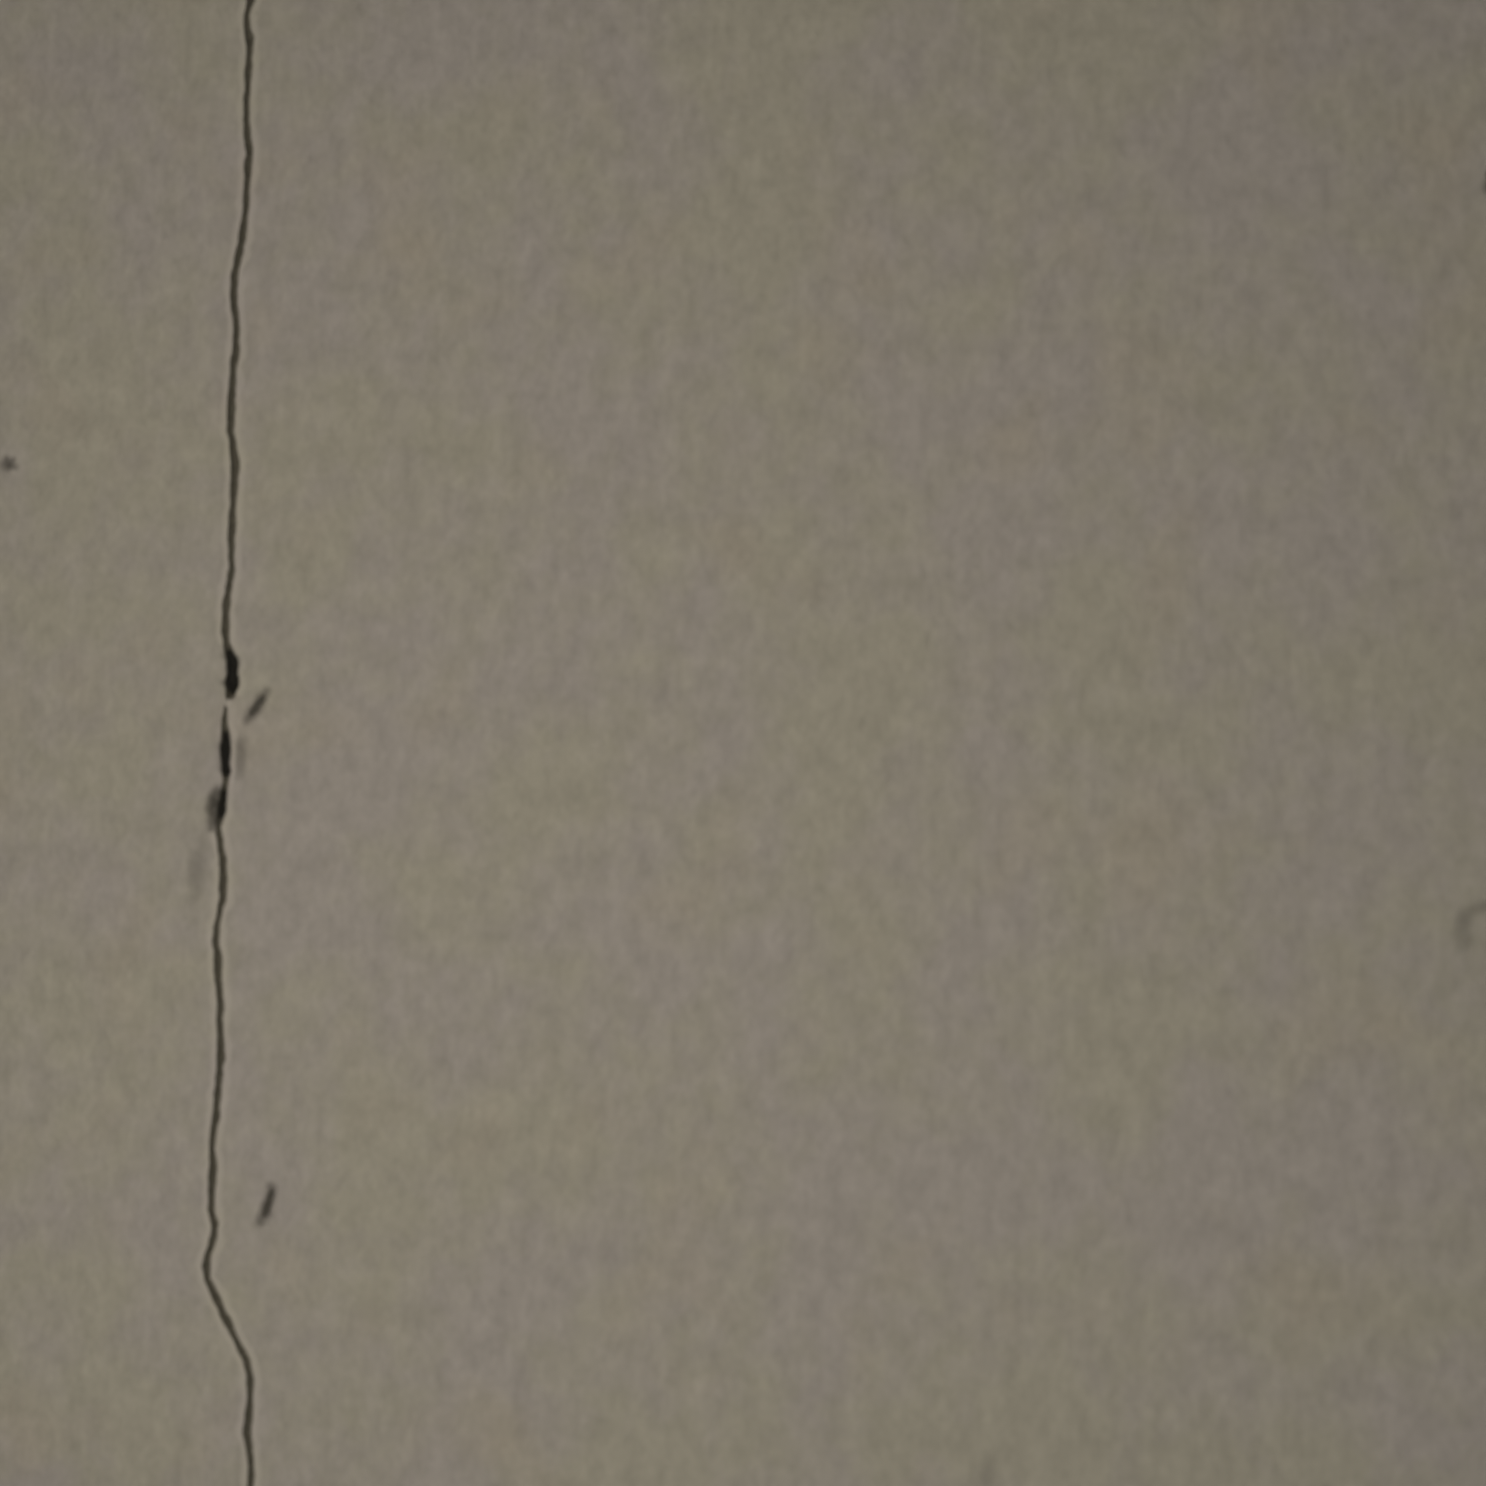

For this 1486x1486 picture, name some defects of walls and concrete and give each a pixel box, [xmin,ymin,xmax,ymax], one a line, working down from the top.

crack [196,0,262,1486]